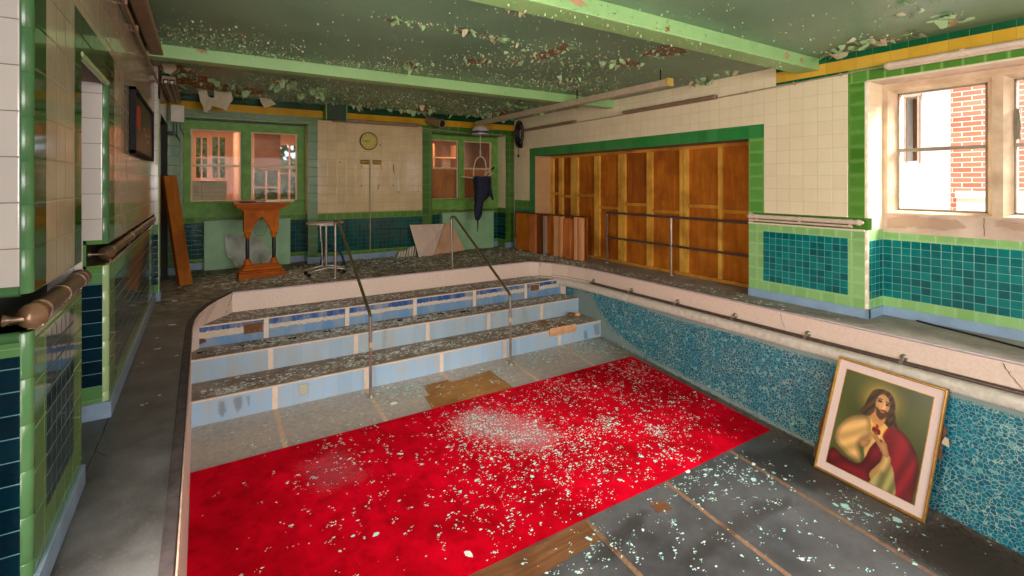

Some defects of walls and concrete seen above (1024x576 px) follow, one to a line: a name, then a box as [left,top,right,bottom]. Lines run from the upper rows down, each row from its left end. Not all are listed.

peeling [155,0,975,123]